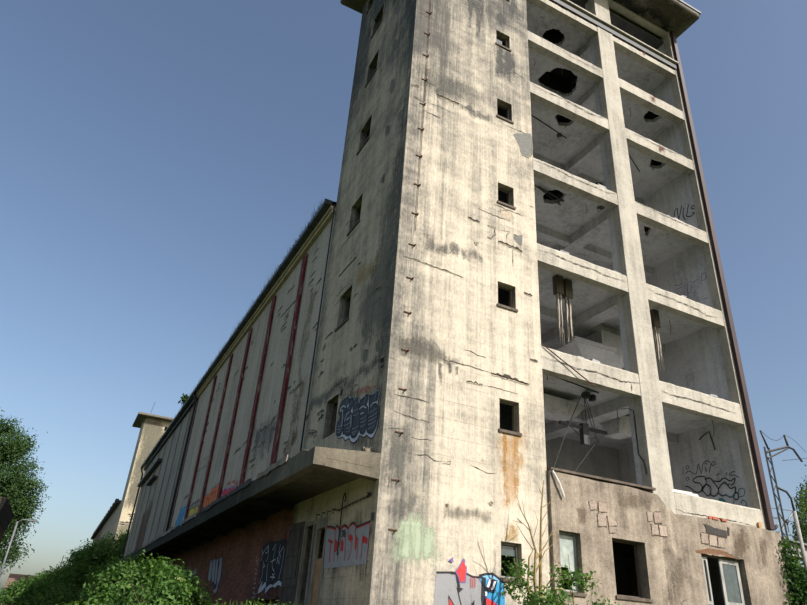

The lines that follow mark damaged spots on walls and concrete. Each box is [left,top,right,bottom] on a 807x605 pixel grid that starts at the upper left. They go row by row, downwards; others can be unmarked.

leakage [353,0,415,100]
spalling [513,133,533,158]
leakage [399,336,458,379]
crack [443,350,517,394]
leakage [127,420,162,509]